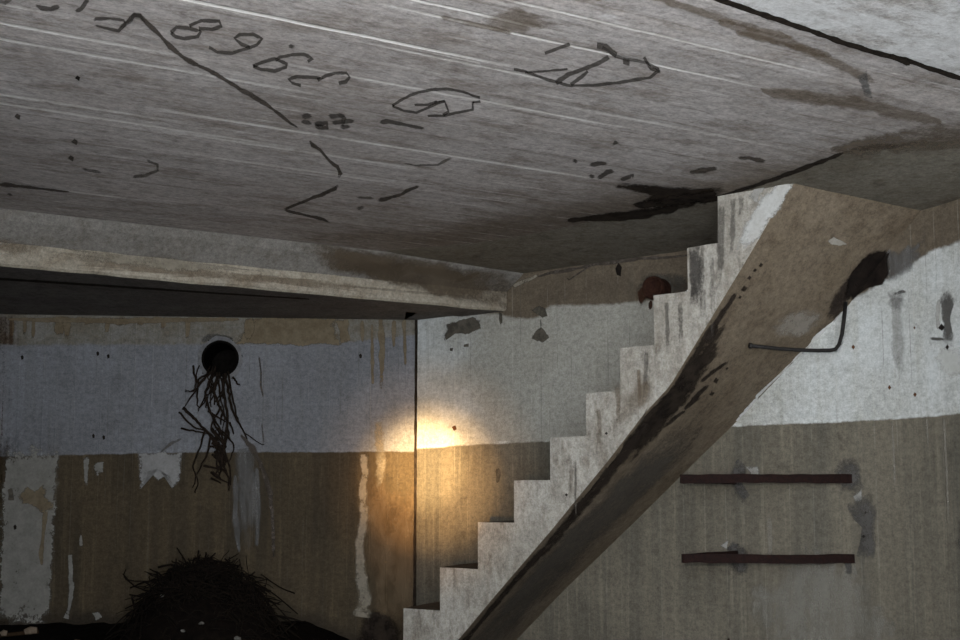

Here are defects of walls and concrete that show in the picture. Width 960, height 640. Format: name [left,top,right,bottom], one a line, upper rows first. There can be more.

damp [568,184,792,302]
damp [829,244,919,317]
peeling [139,451,183,488]
peeling [0,445,59,624]